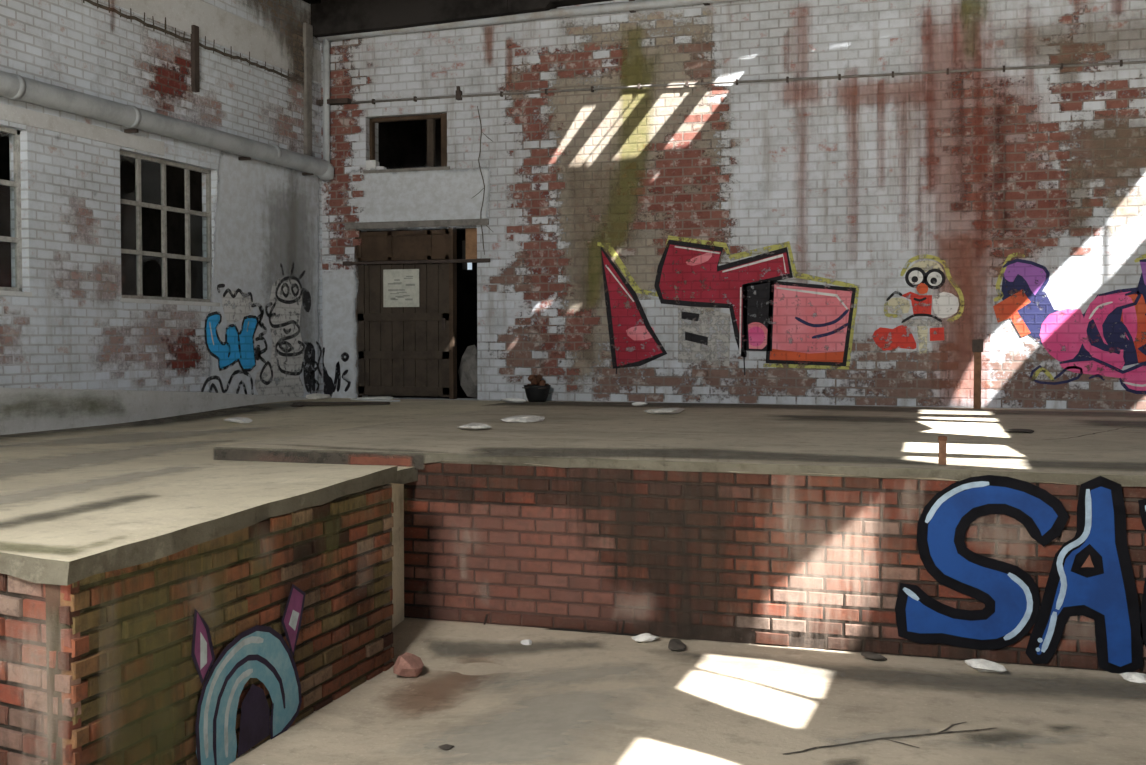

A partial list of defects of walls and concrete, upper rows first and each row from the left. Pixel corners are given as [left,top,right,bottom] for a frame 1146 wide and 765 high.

peeling [137,40,224,125]
peeling [274,38,372,272]
peeling [486,11,959,406]
peeling [1043,5,1146,238]